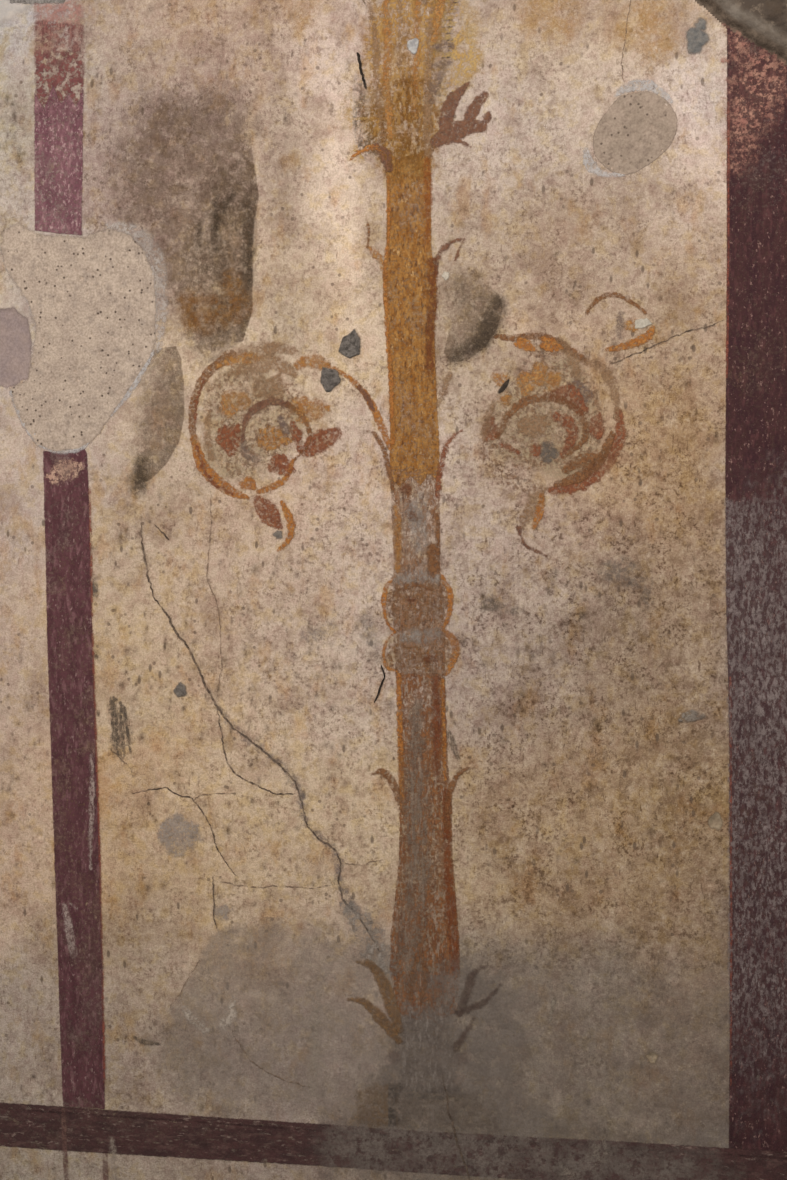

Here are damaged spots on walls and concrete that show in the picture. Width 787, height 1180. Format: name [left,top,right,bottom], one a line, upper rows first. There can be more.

spalling [687,19,709,53]
peeling [721,32,787,173]
crack [111,499,382,957]